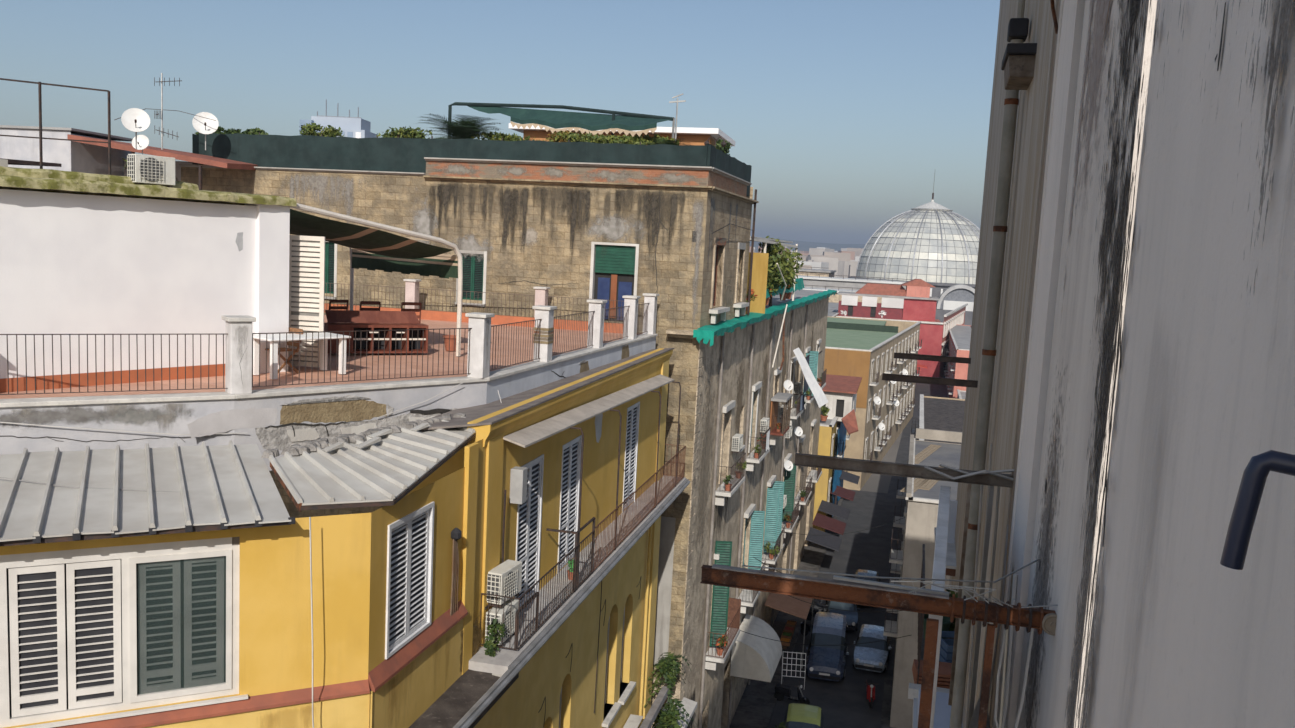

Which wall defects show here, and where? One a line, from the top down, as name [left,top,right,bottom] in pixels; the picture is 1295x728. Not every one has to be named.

leakage [430,183,738,316]
spalling [255,395,461,451]